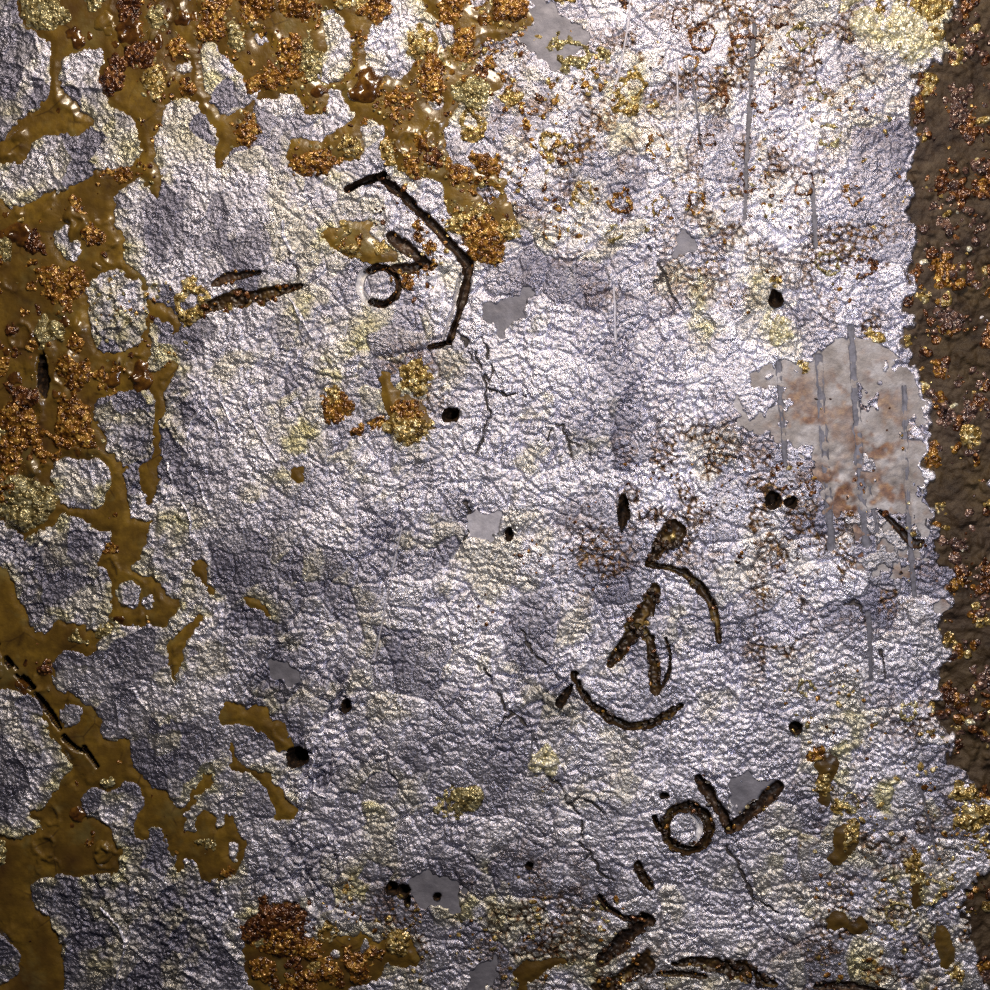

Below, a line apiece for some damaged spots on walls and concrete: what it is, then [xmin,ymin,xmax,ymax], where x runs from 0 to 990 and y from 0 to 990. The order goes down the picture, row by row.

peeling [482,287,535,339]
spalling [37,353,51,398]
hole [441,407,460,422]
rust [623,436,720,486]
spalling [341,699,352,714]
hole [286,746,309,769]
peeling [385,870,468,914]
peeling [467,954,499,990]